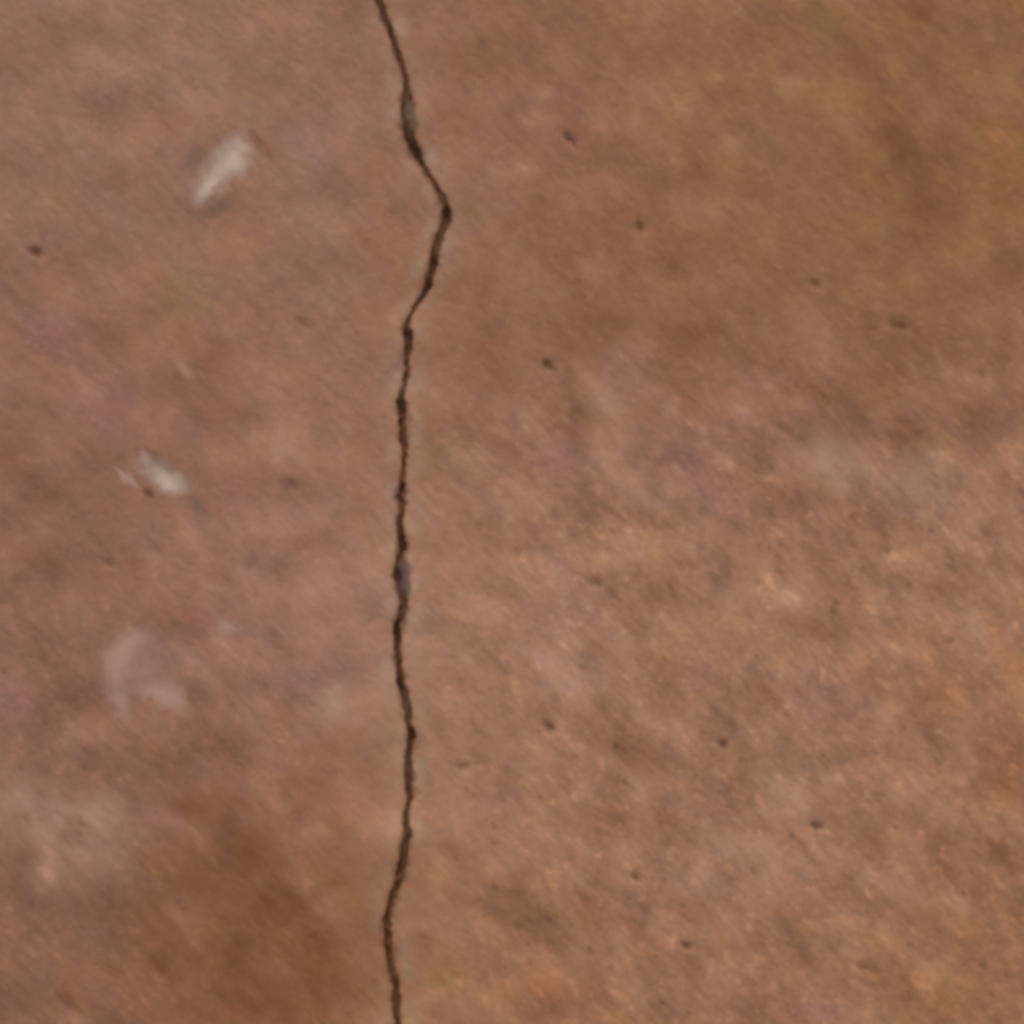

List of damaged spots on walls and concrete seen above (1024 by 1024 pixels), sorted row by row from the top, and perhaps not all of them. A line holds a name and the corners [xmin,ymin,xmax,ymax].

crack [375,0,451,1024]